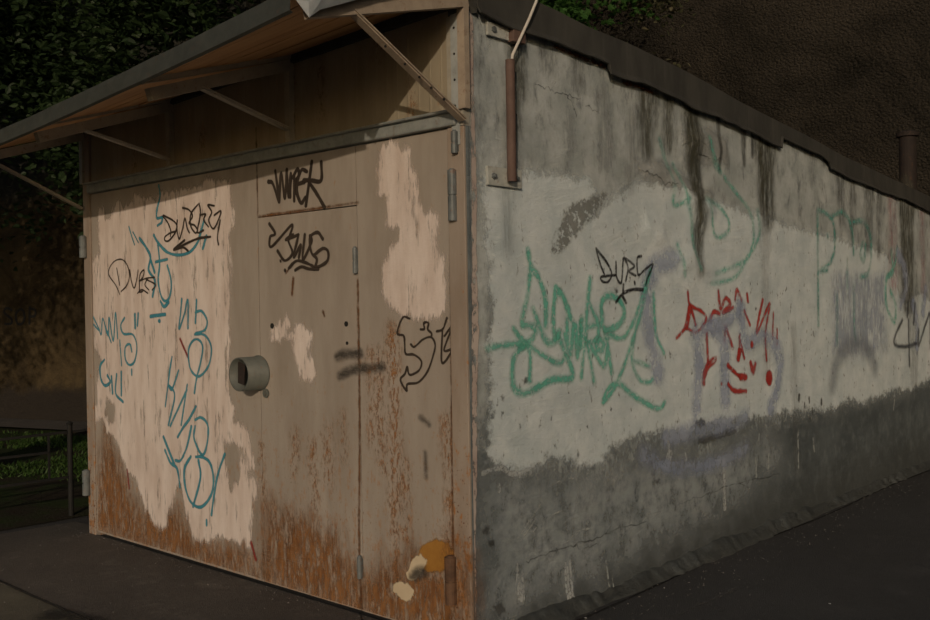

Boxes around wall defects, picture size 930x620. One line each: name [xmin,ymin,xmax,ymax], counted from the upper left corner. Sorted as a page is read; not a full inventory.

water stain [640,83,673,156]
water stain [684,105,704,273]
water stain [742,130,775,227]
water stain [900,200,914,313]
rust [98,279,470,620]